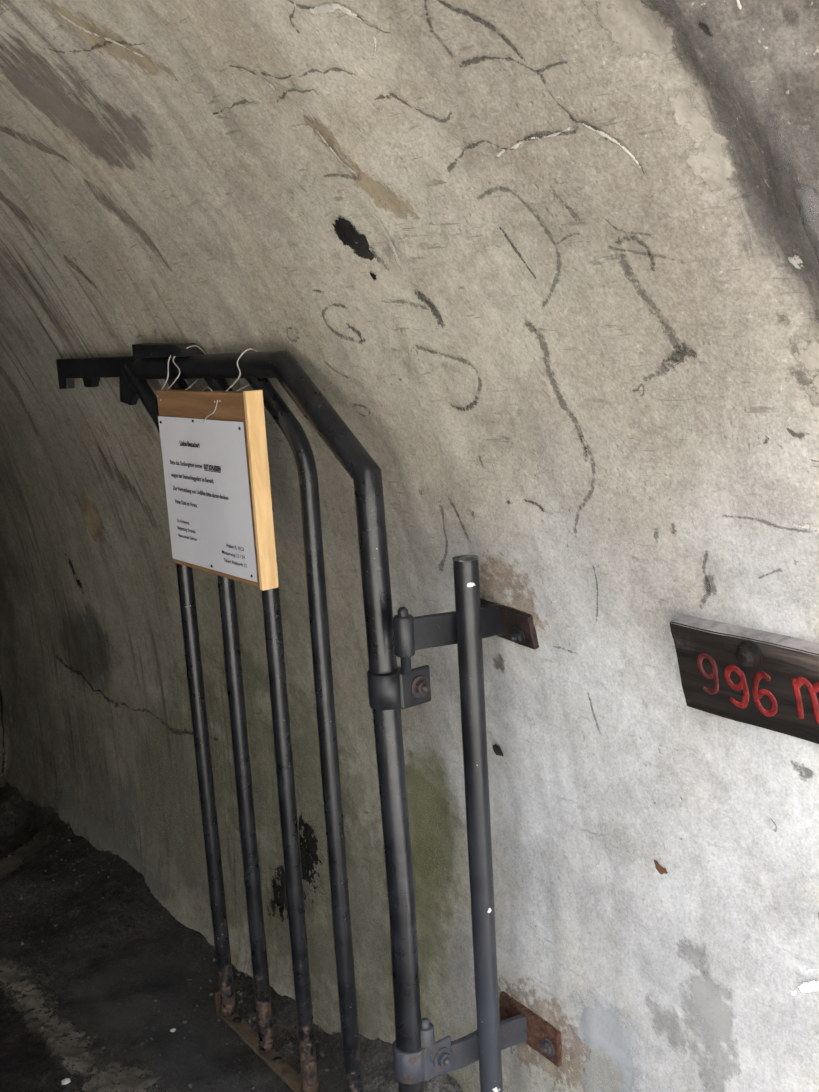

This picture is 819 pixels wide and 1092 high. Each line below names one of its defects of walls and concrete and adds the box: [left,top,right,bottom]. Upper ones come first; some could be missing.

crack [288,0,390,59]
crack [213,100,248,114]
crack [230,65,352,101]
crack [375,93,451,123]
crack [447,72,644,173]
crack [55,654,218,740]